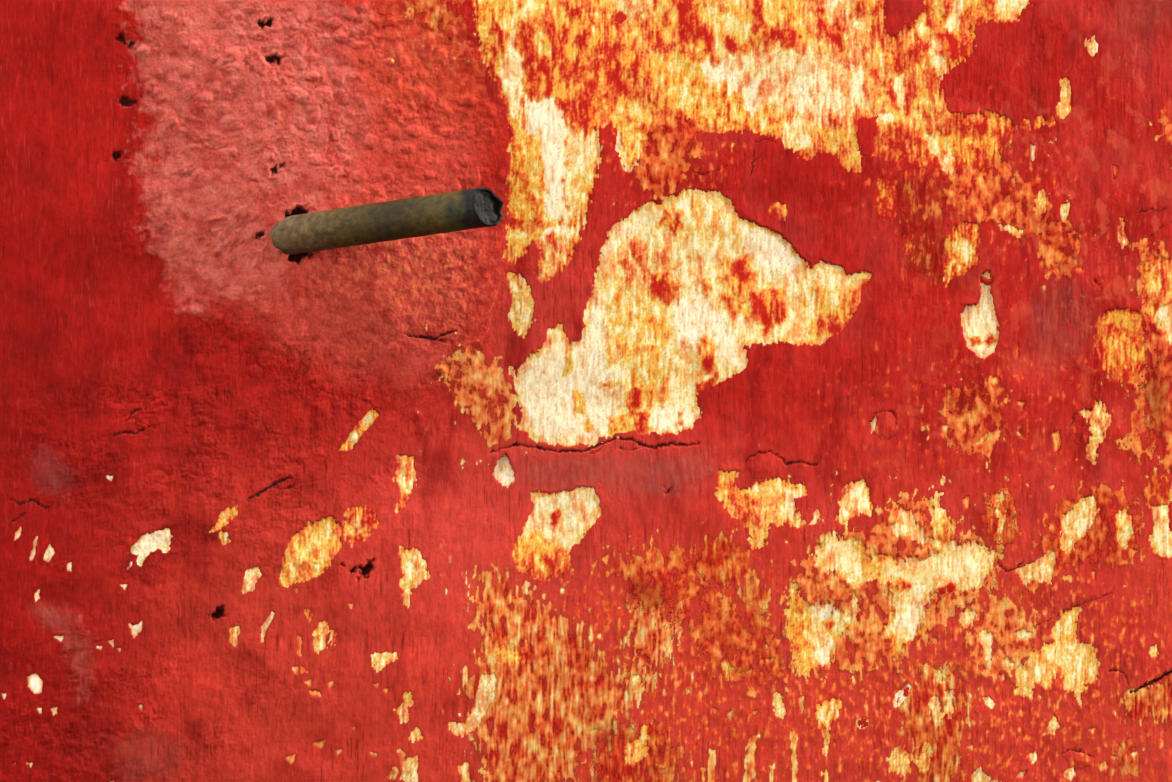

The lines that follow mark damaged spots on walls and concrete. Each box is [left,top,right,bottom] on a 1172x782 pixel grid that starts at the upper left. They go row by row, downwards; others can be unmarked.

peeling [1138,107,1172,145]
peeling [405,0,1082,488]
crack [489,437,700,454]
peeling [448,217,1172,782]
peeling [127,528,173,570]
peeling [277,505,379,593]
peeling [129,621,142,638]